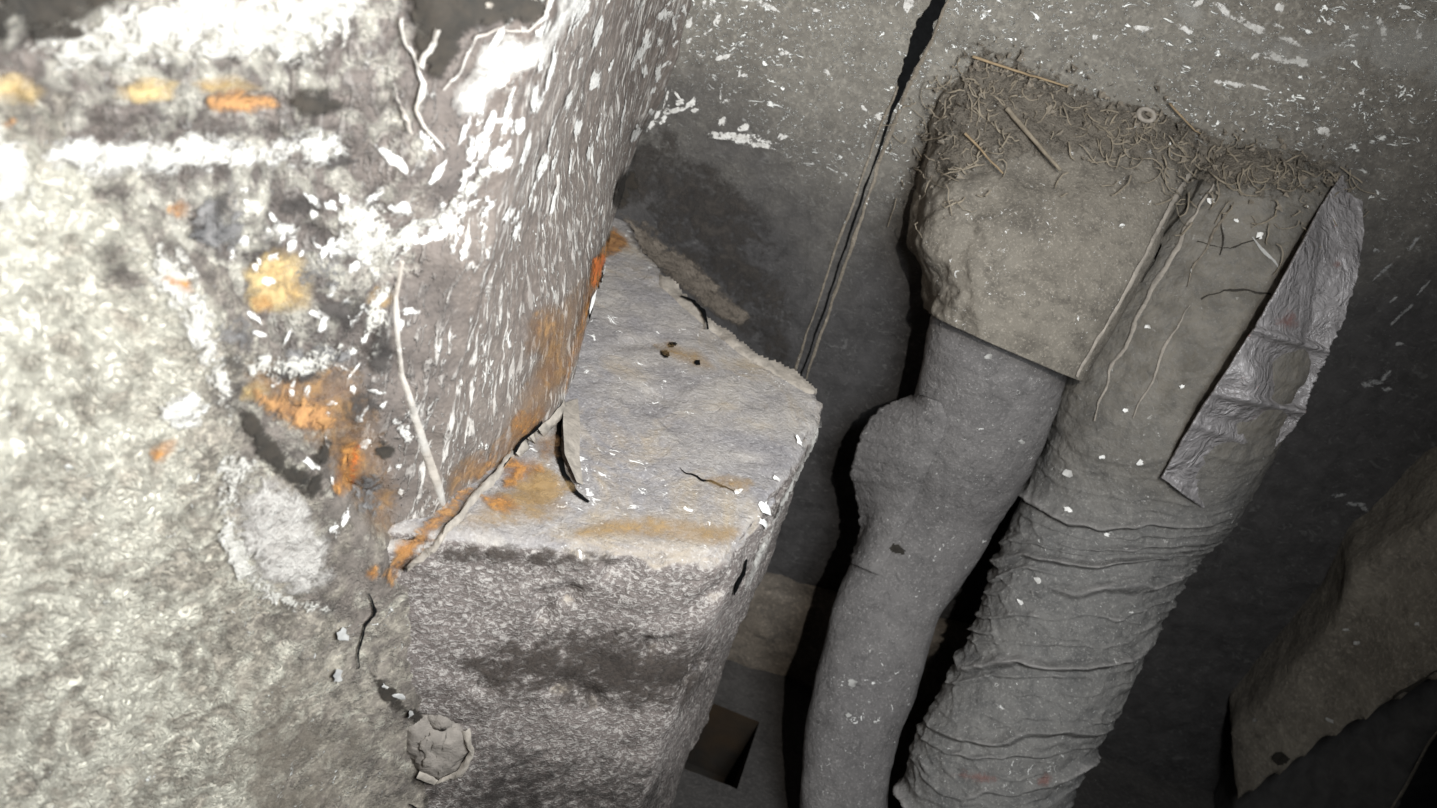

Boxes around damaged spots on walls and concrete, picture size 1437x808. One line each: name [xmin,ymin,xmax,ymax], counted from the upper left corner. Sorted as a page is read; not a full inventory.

rust [0,78,35,100]
rust [129,78,174,103]
rust [204,83,276,112]
crack [795,0,950,380]
rust [248,256,303,309]
rust [535,230,627,391]
rust [246,370,377,494]
rust [369,409,569,585]
crack [555,417,590,503]
crack [681,469,734,491]
crack [357,593,377,669]